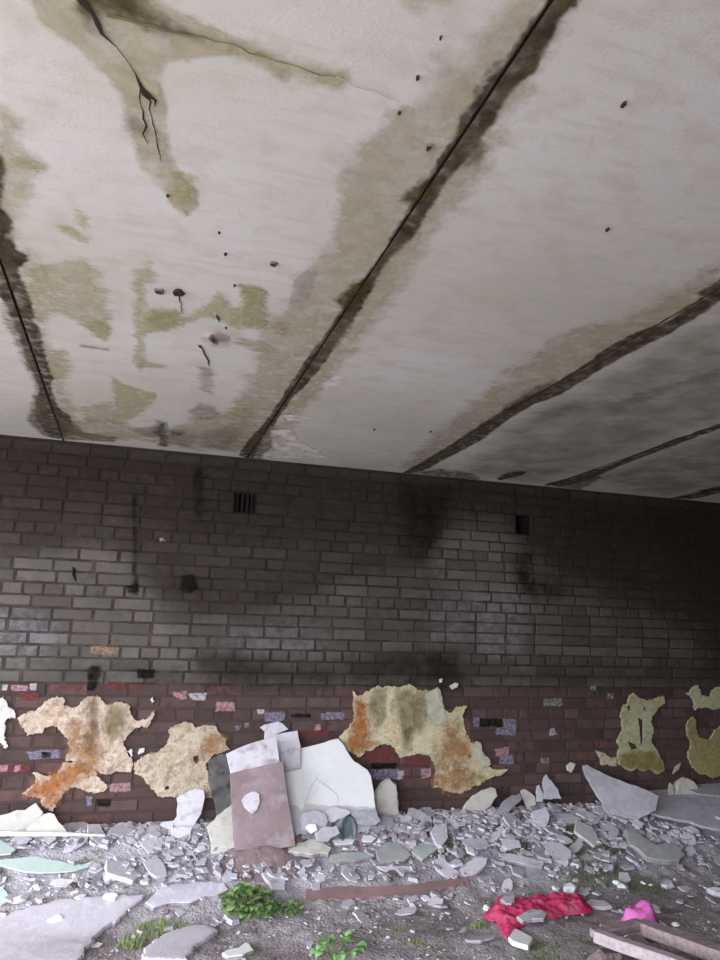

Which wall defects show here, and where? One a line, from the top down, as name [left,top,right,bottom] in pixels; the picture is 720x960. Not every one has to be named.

crack [77,0,399,162]
leakage [0,0,577,459]
leakage [404,270,720,480]
leakage [545,424,720,490]
leakage [672,486,720,499]
corrosion [24,720,103,806]
flaking render [0,682,230,812]
flaking render [257,678,516,794]
flaking render [595,685,720,778]